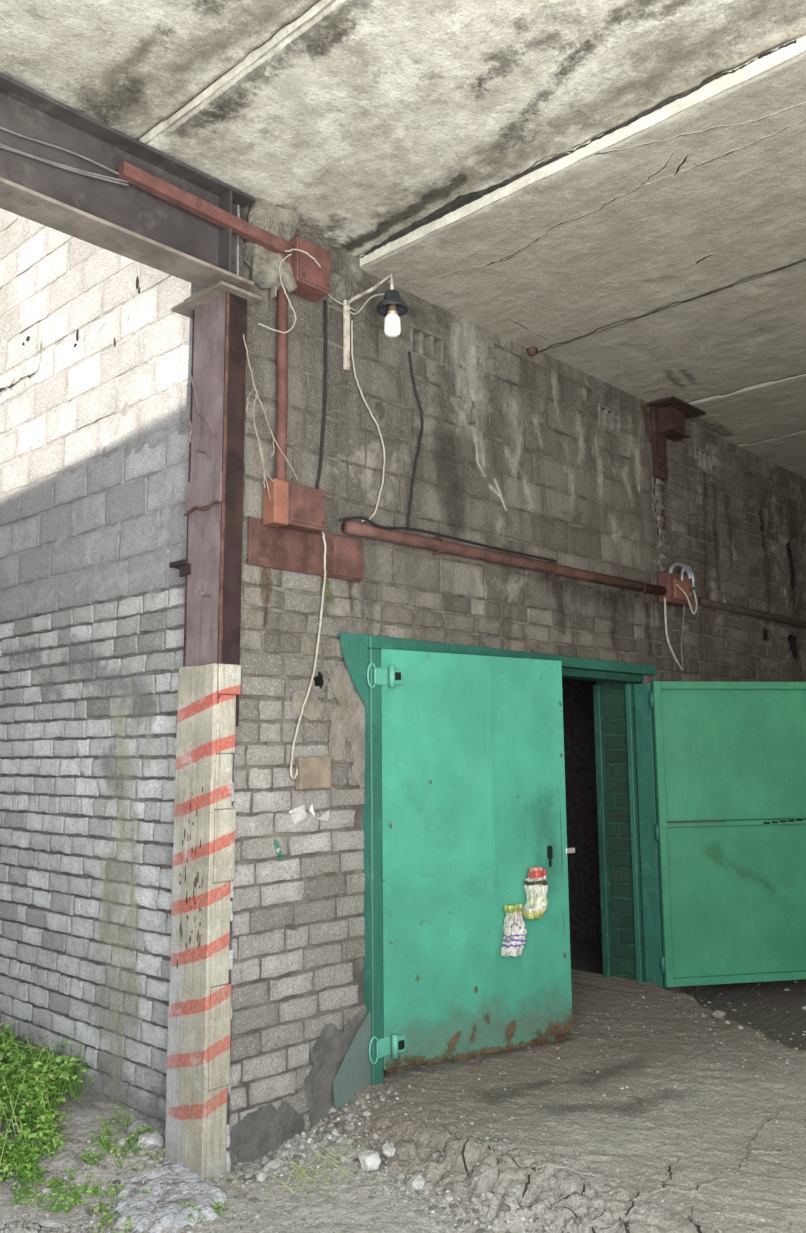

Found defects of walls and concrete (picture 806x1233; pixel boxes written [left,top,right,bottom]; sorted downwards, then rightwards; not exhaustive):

damp [179,0,365,134]
crack [435,101,806,277]
damp [436,432,462,535]
damp [452,317,507,510]
damp [505,399,532,509]
damp [577,414,603,495]
damp [621,449,641,499]
rust [385,1019,573,1076]